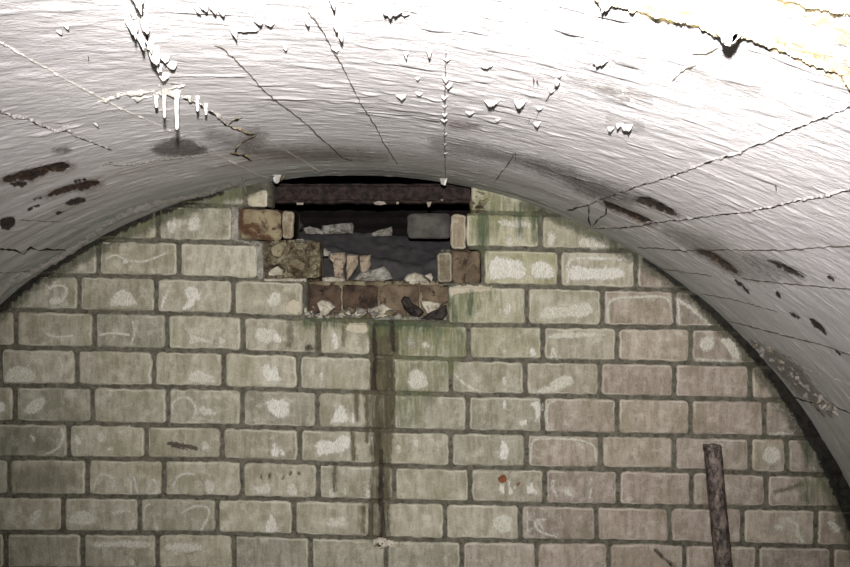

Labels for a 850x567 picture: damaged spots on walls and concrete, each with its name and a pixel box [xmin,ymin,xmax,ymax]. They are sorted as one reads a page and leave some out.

peeling [125,0,177,81]
crack [0,42,321,179]
damp [152,135,208,157]
crack [215,45,351,161]
spalling [263,240,324,278]
crack [308,12,397,163]
spalling [273,175,450,184]
spalling [271,204,473,236]
crack [566,0,850,232]
damp [304,320,346,350]
damp [489,203,850,544]
damp [314,320,430,548]